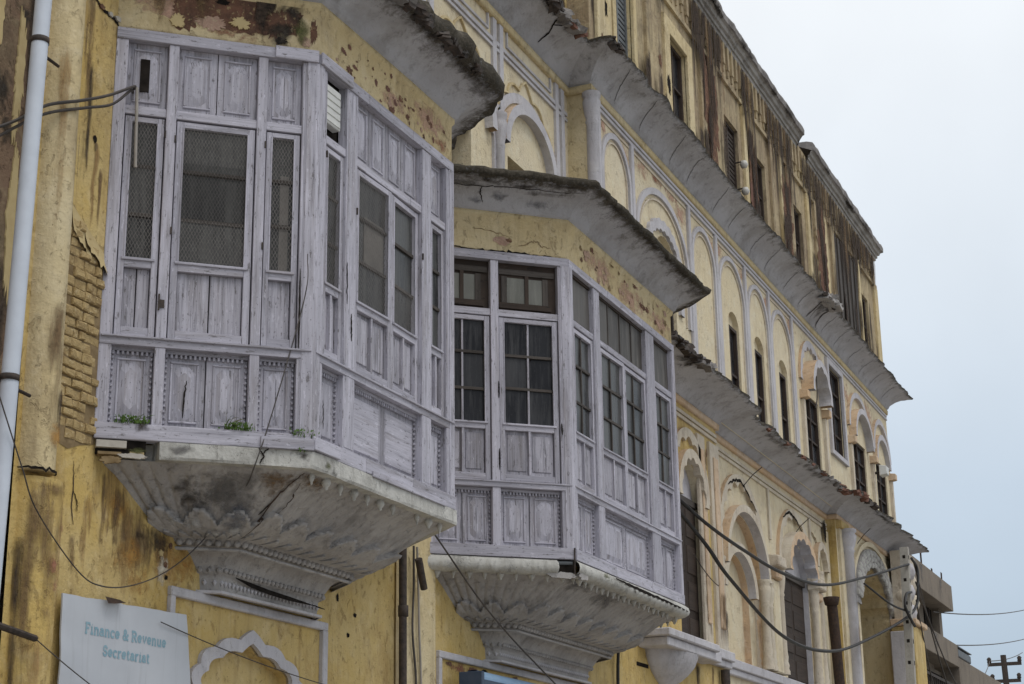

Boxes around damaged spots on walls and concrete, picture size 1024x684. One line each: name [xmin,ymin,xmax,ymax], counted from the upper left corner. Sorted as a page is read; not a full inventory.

leakage [24,0,35,72]
peeling [139,0,318,47]
leakage [78,0,96,165]
leakage [691,0,729,180]
crack [454,183,579,202]
leakage [738,64,878,356]
leakage [50,311,63,364]
spalling [58,205,147,464]
crack [17,465,78,525]
leakage [83,477,191,575]
crack [245,473,304,536]